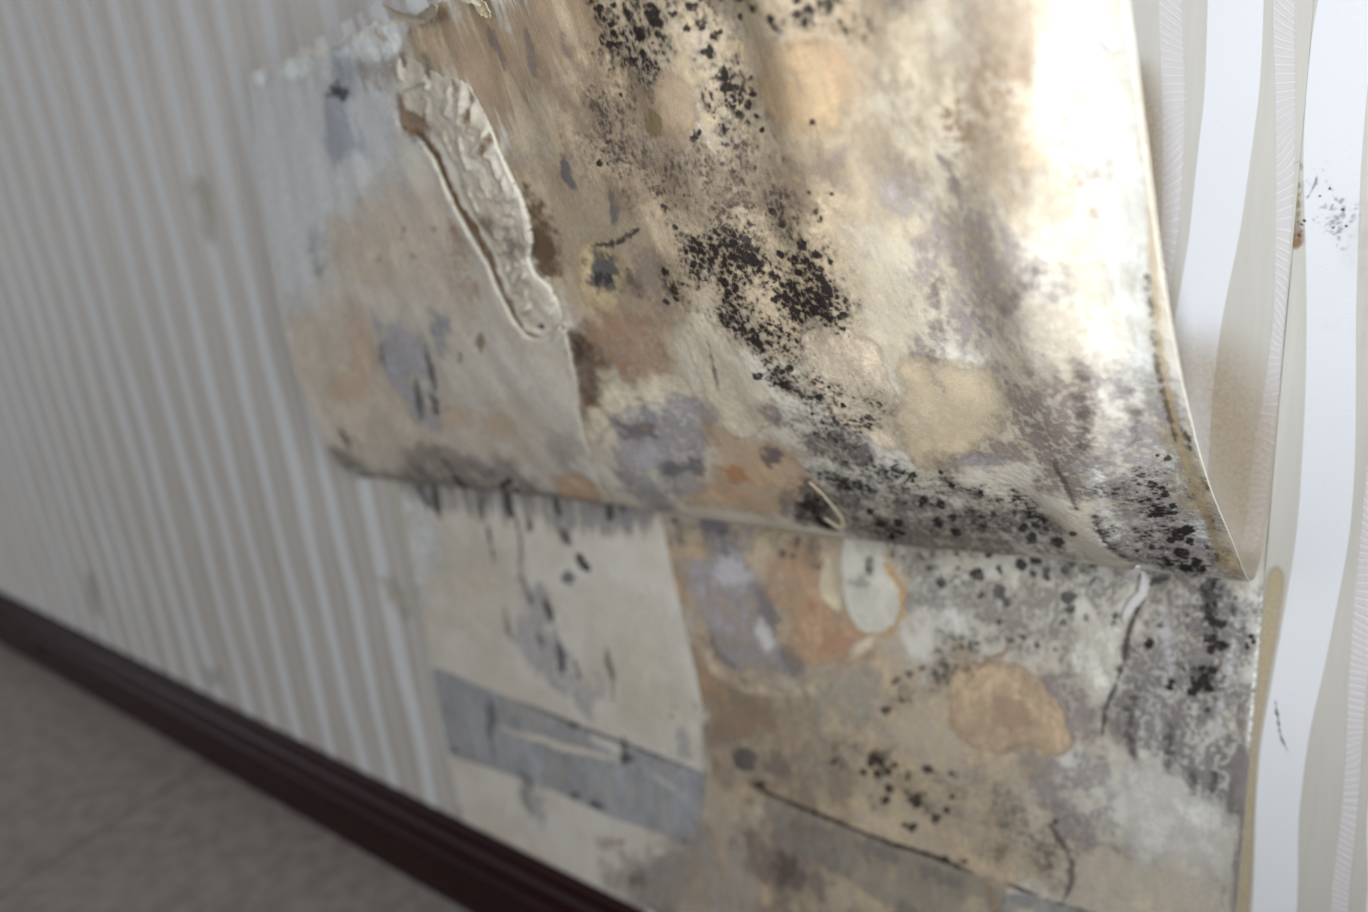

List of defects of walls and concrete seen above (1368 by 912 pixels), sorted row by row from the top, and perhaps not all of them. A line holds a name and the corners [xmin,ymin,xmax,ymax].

water stain [254,0,1283,912]
peeling [499,725,621,766]
crack [749,780,973,873]
crack [1005,845,1088,912]